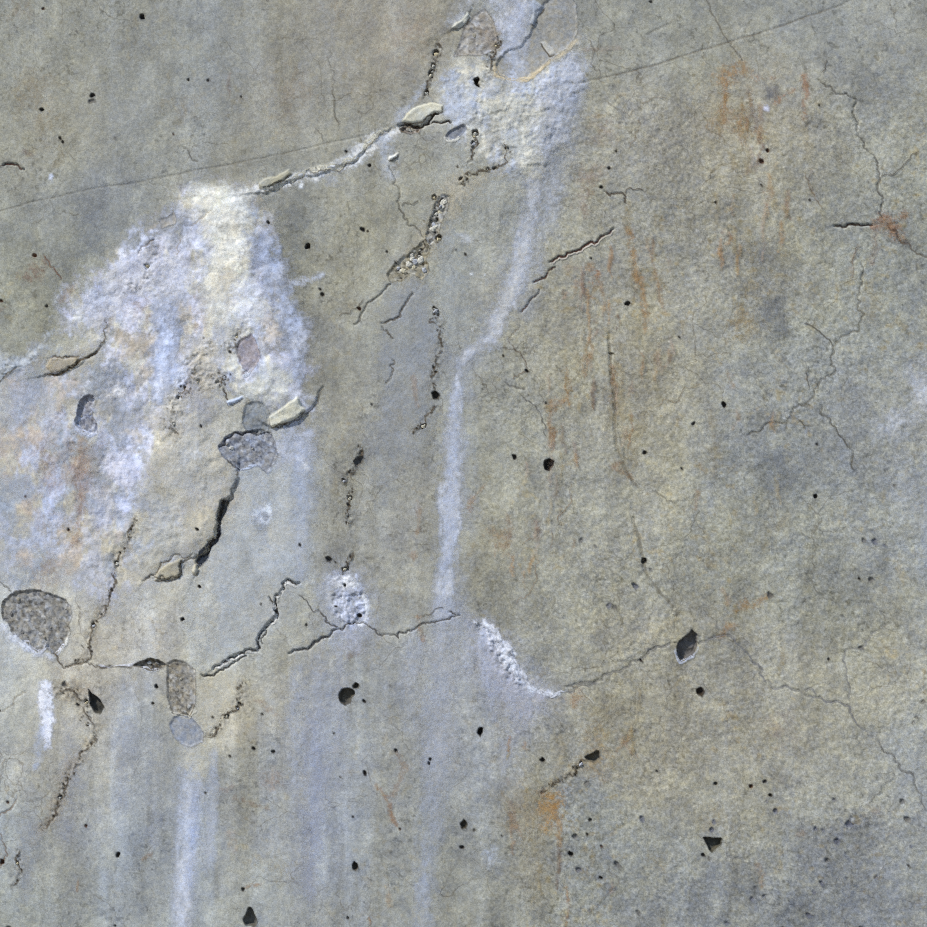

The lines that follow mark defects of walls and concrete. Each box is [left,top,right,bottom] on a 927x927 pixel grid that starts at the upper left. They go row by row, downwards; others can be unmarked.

crack [262,43,450,189]
crack [457,130,511,186]
leakage [0,84,426,665]
spalling [218,396,305,473]
crack [339,194,443,338]
leakage [380,275,444,457]
leakage [405,0,588,628]
crack [145,498,227,580]
spalling [1,589,72,655]
crack [46,520,137,829]
spalling [133,658,204,747]
crack [203,579,670,738]